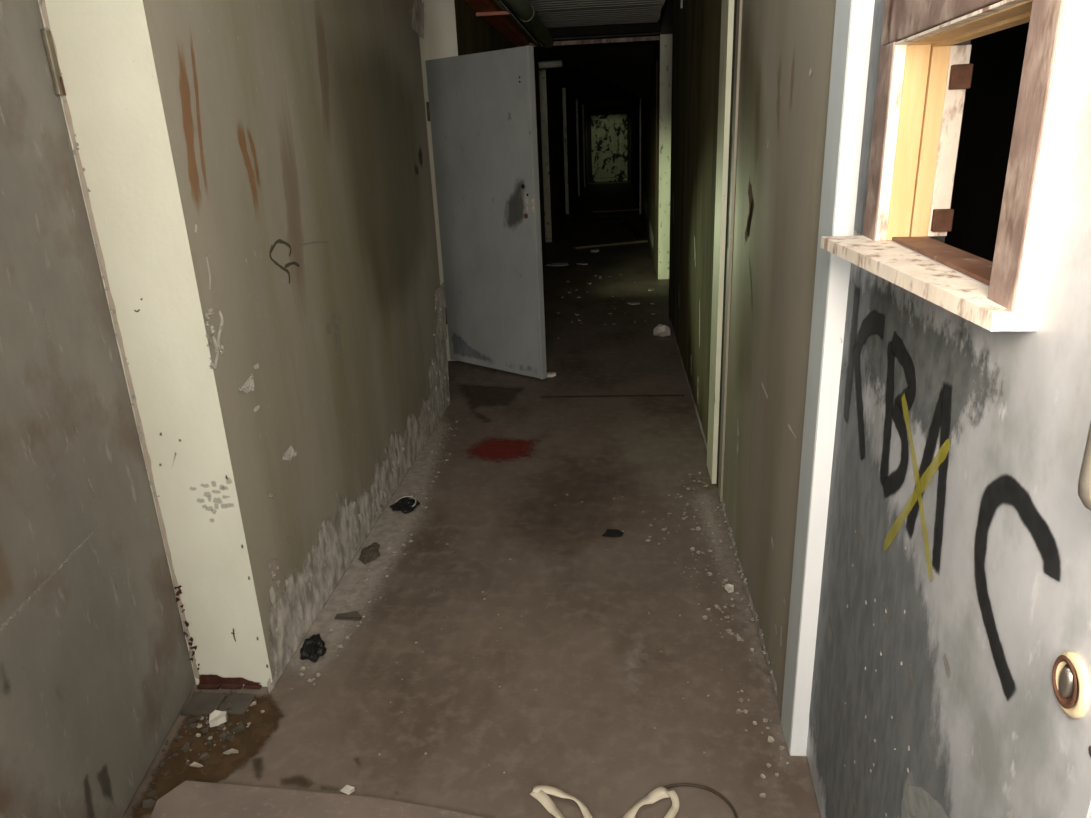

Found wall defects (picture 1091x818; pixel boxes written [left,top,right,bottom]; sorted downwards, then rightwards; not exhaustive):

rust [180,49,206,198]
rust [238,130,259,198]
peeling [175,283,451,727]